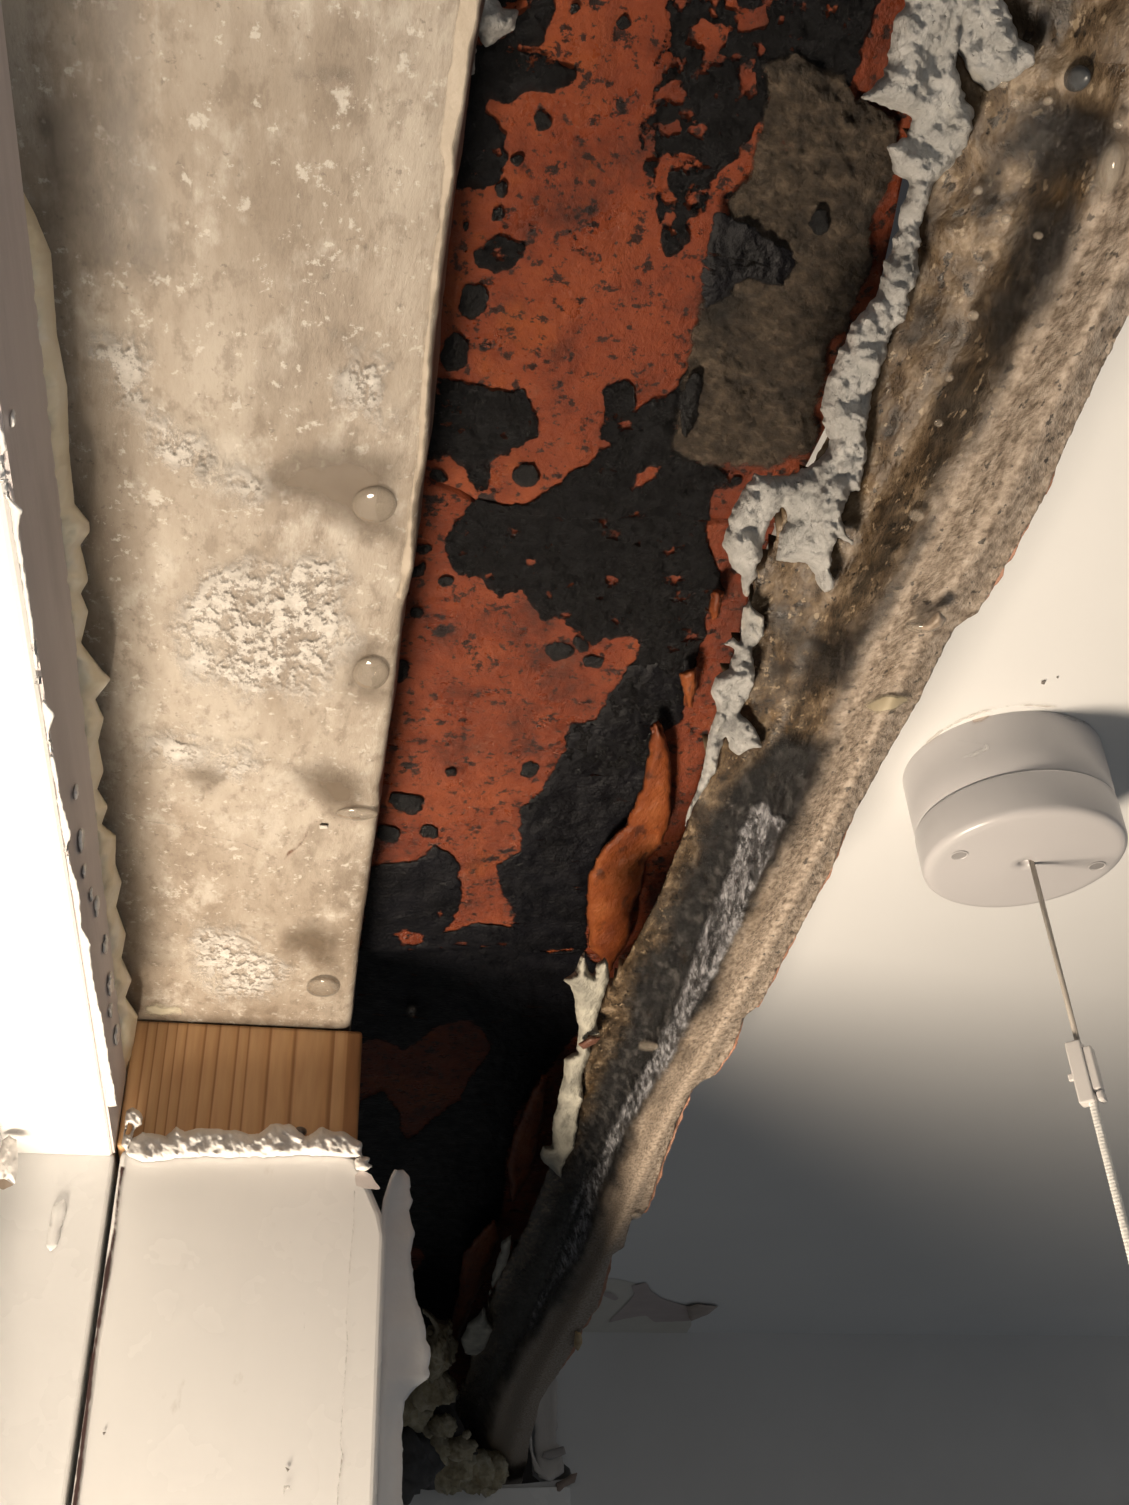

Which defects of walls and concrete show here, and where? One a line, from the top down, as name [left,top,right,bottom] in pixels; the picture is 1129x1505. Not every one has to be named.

damp [1005,106,1112,183]
damp [987,203,1076,371]
damp [173,557,371,695]
damp [790,597,891,688]
damp [867,696,908,711]
damp [148,736,257,778]
damp [193,929,287,998]
damp [465,739,833,1446]
flaking render [355,1169,431,1505]
peeling [574,1279,718,1351]
flaking render [522,1378,577,1492]